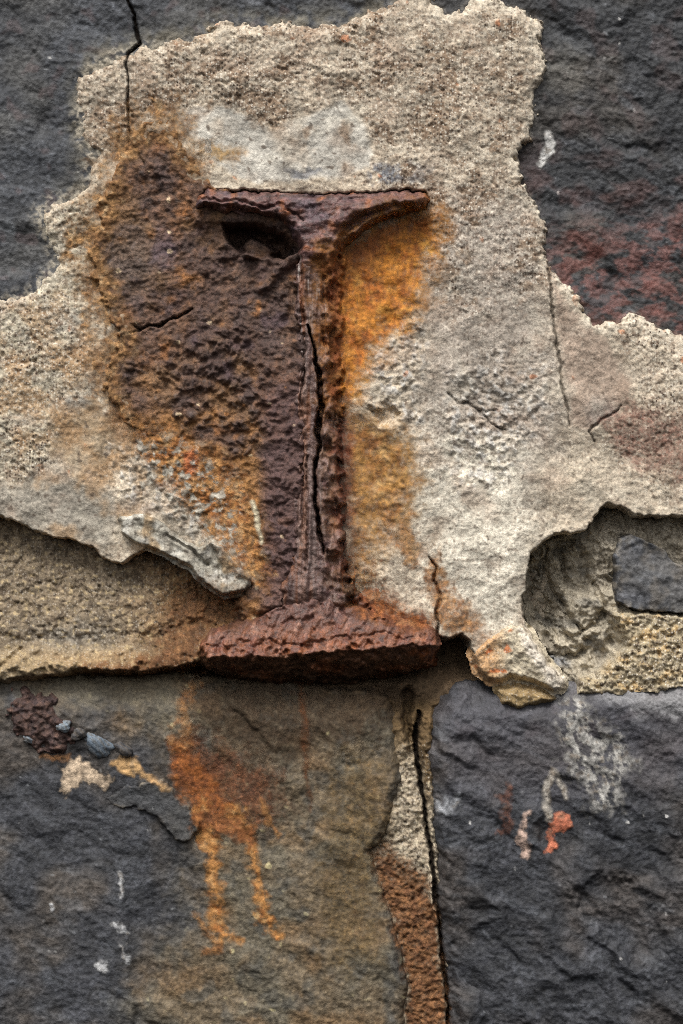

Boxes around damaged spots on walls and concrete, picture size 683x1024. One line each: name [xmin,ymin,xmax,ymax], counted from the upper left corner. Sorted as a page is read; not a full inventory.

crack [125,0,145,164]
corrosion [62,98,478,671]
spalling [0,513,252,684]
spalling [522,507,683,695]
corrosion [168,737,284,954]
corrosion [373,846,449,1024]
crack [413,710,449,1024]